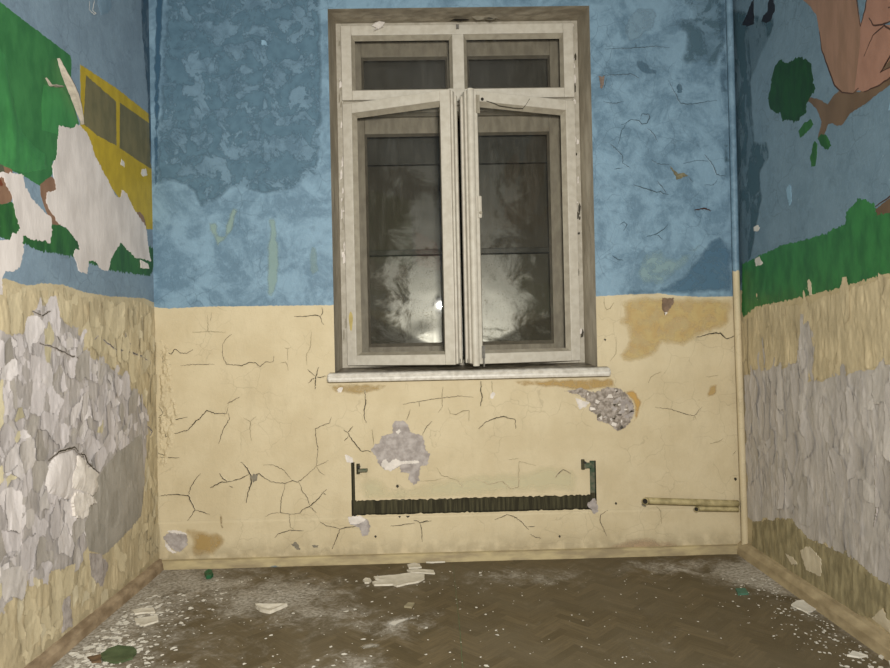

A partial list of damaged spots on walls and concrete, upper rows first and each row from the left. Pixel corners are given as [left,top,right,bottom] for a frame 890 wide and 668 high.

damp [624,0,773,359]
crack [39,342,79,359]
peeling [0,58,188,668]
crack [94,307,326,389]
crack [696,331,734,340]
crack [403,381,517,436]
spalling [568,387,634,431]
crack [147,390,374,549]
spalling [371,421,430,485]
peeling [734,273,890,633]
crack [390,520,431,542]
peeling [847,650,890,668]